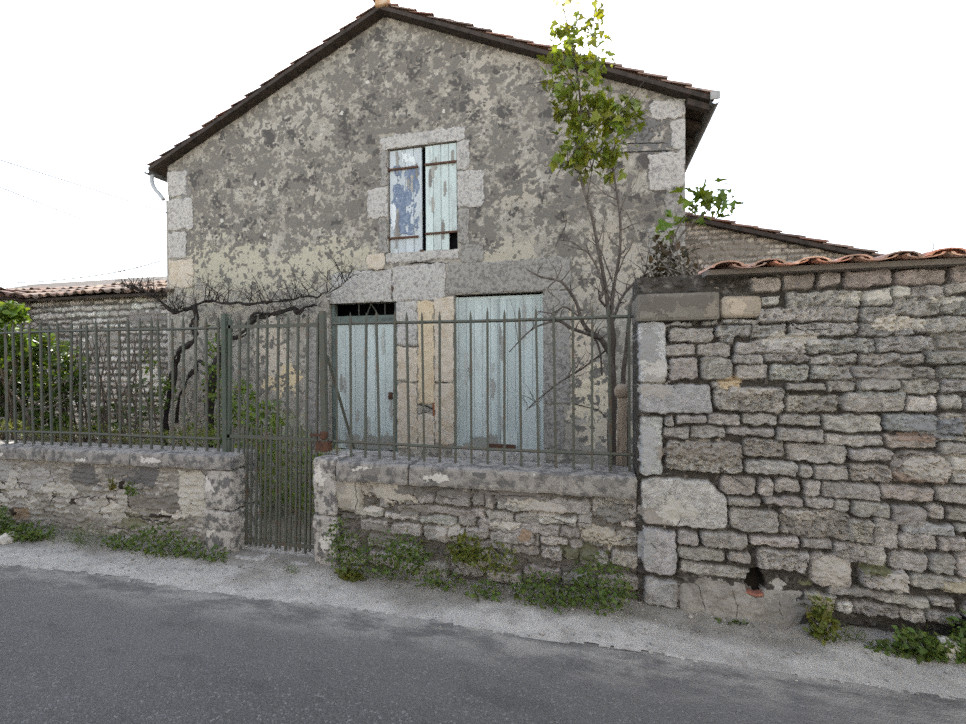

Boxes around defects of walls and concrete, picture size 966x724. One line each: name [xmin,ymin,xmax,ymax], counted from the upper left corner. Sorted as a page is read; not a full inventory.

peeling [482,235,540,263]
spalling [744,567,786,590]